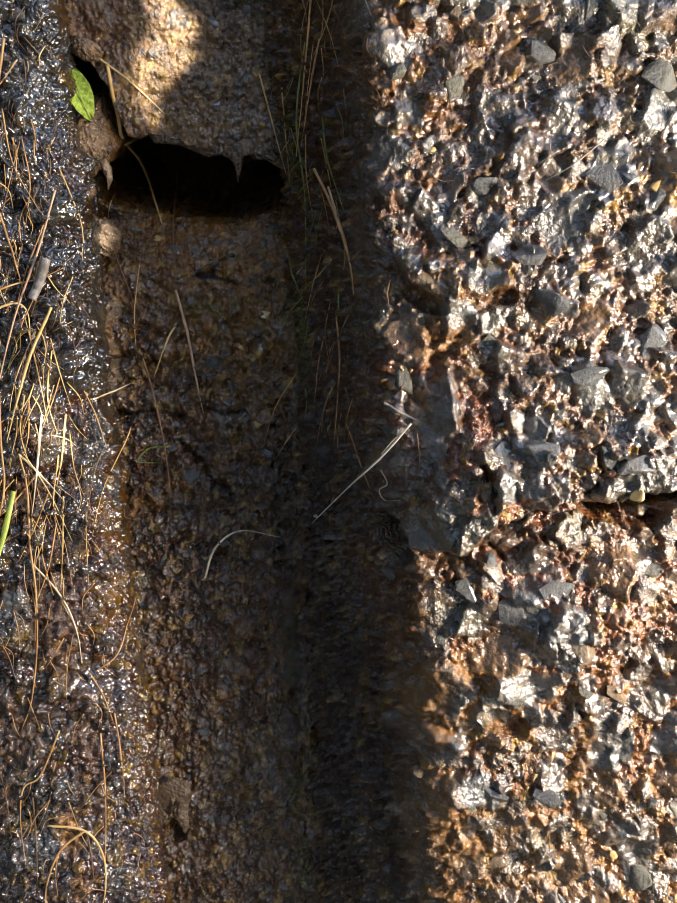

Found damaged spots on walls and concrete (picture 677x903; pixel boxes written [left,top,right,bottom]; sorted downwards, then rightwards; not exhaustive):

crack [462,464,531,559]
crack [560,459,604,513]